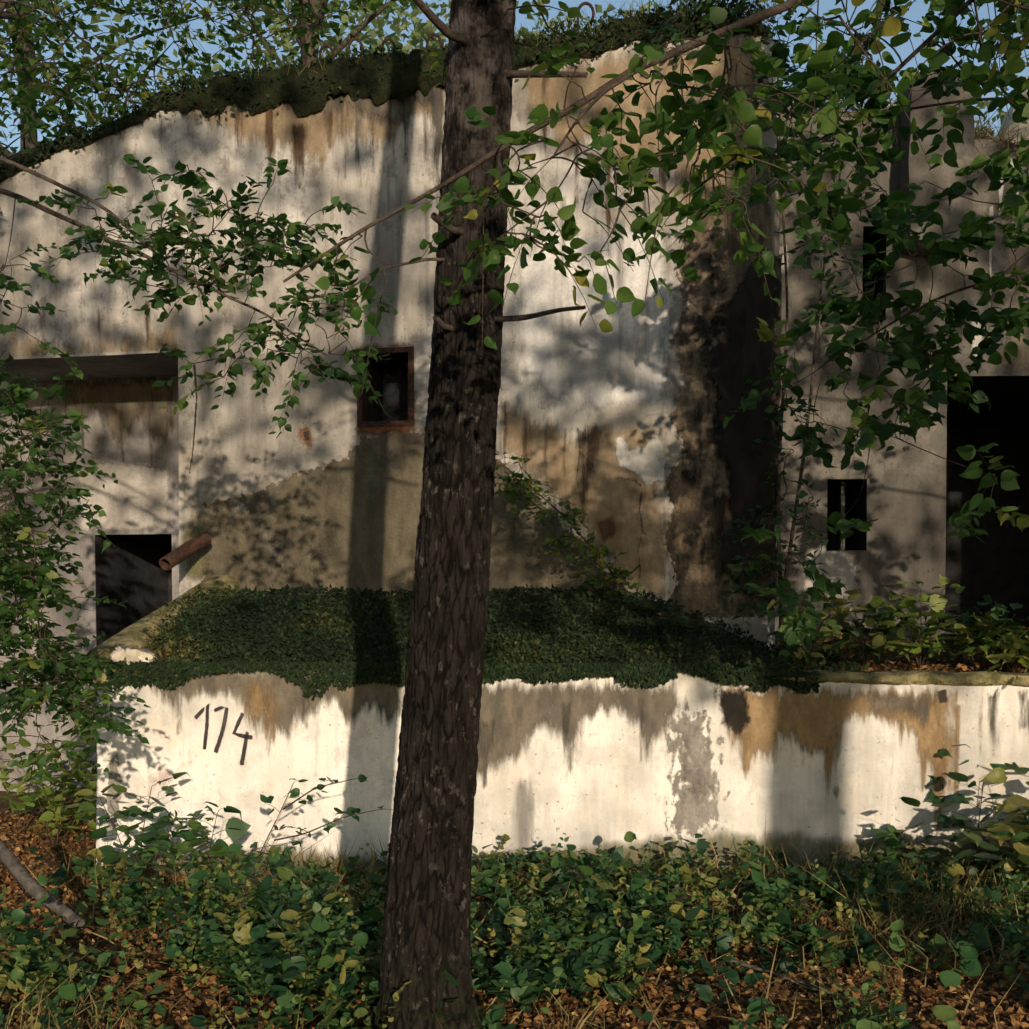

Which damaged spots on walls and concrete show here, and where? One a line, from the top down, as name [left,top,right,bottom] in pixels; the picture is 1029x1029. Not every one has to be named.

leakage [194,85,443,182]
rust [300,427,311,446]
spalling [489,168,775,619]
peeling [201,427,425,599]
leakage [150,670,402,736]
leakage [477,683,687,787]
leakage [715,686,960,826]